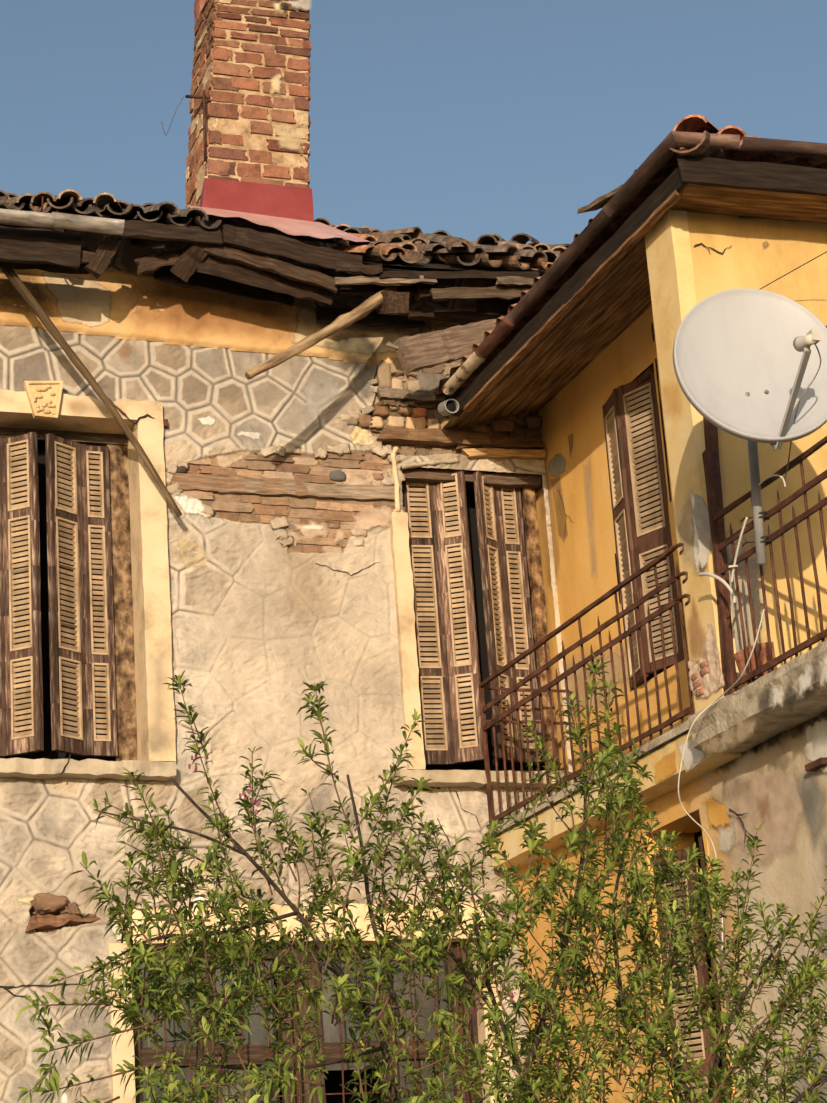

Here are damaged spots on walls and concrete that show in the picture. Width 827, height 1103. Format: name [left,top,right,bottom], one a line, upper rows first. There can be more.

peeling [42,272,111,327]
crack [108,398,154,425]
spalling [165,308,566,553]
spalling [690,491,711,573]
spalling [688,622,725,698]
crack [0,983,84,997]